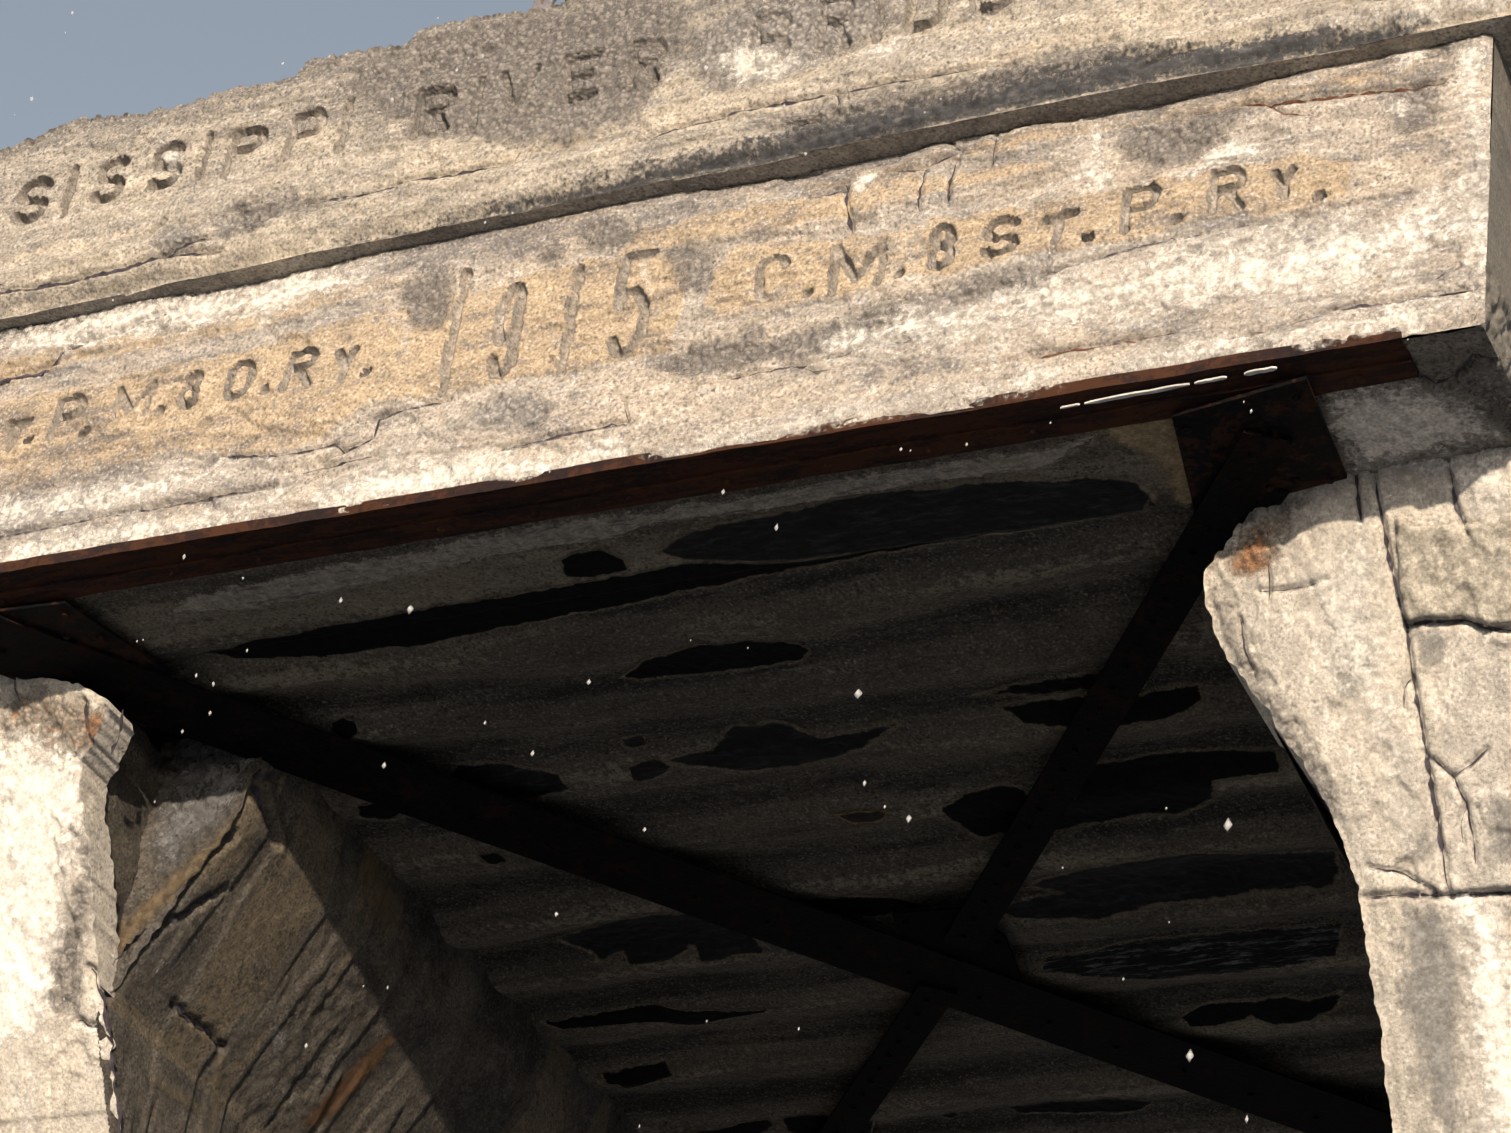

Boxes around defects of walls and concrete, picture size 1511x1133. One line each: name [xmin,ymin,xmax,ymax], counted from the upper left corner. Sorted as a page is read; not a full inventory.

crack [1195,83,1444,116]
crack [0,223,222,294]
rust [1098,419,1192,505]
crack [1447,461,1468,534]
rust [1230,531,1275,577]
crack [1355,475,1511,898]